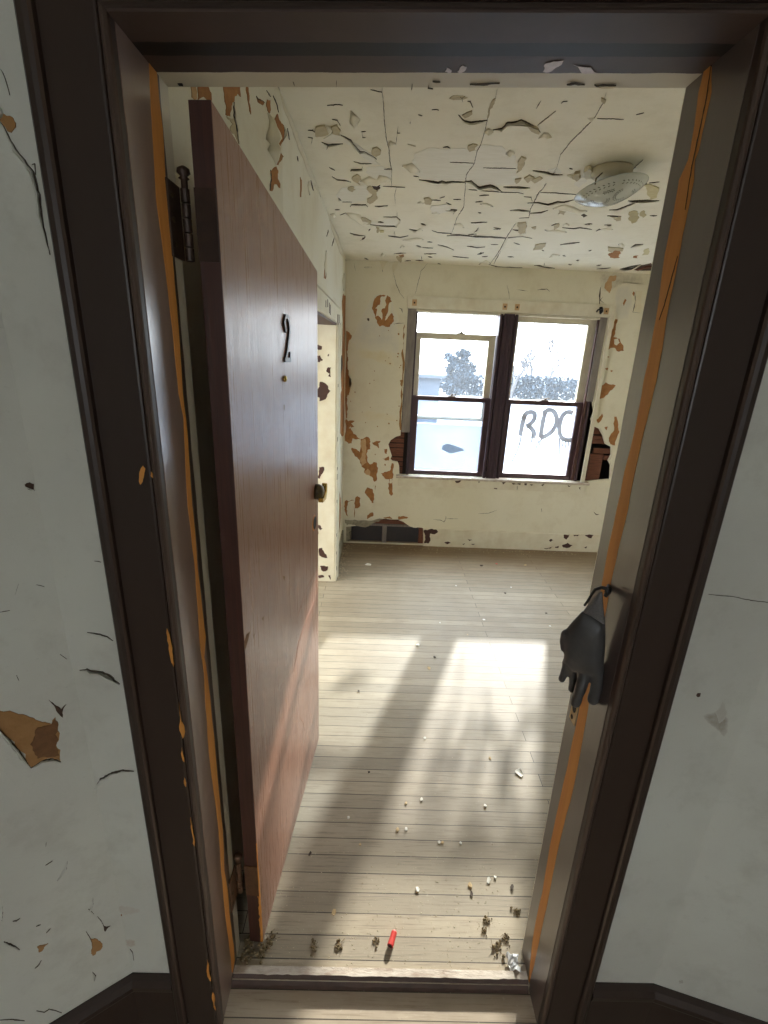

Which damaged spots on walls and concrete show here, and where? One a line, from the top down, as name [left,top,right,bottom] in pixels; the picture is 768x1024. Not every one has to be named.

crack [0,69,50,255]
peeling [178,83,271,144]
peeling [308,119,593,240]
crack [266,87,644,304]
peeling [317,275,450,544]
peeling [597,65,712,617]
flaking render [0,700,66,769]
crack [60,654,120,685]
crack [87,632,113,641]
peeling [149,63,235,972]
peeling [318,548,337,580]
peeling [529,683,591,983]